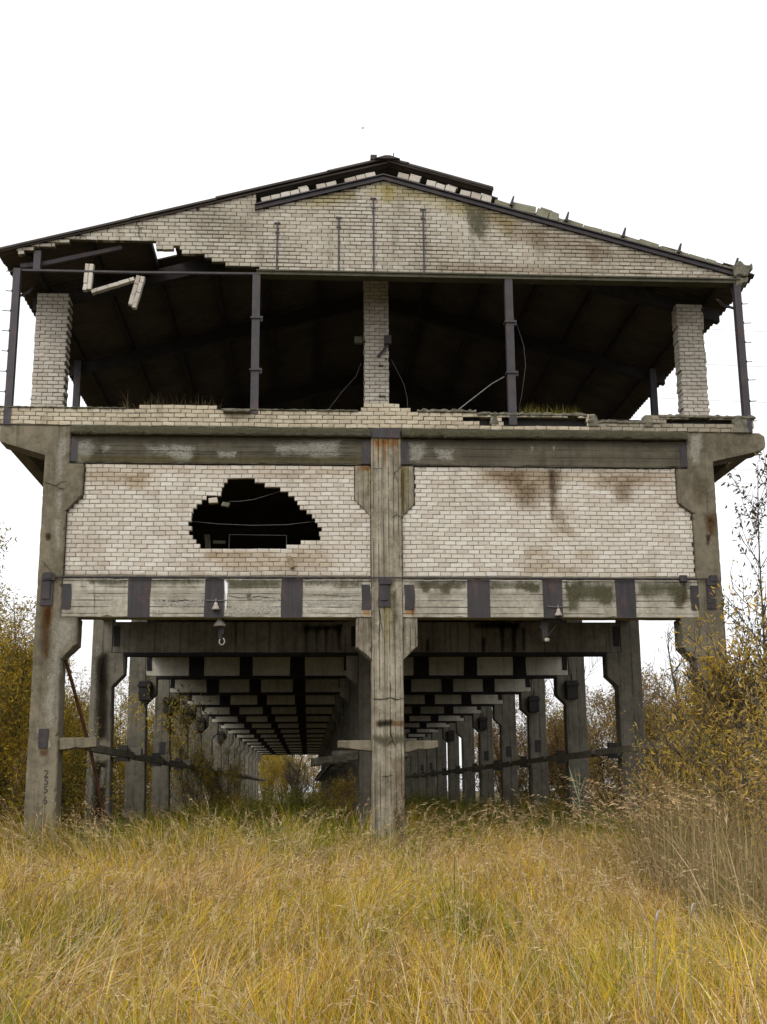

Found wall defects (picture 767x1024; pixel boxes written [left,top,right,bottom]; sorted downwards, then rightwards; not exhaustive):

water stain [466,207,489,239]
water stain [566,585,582,611]
water stain [595,586,612,604]